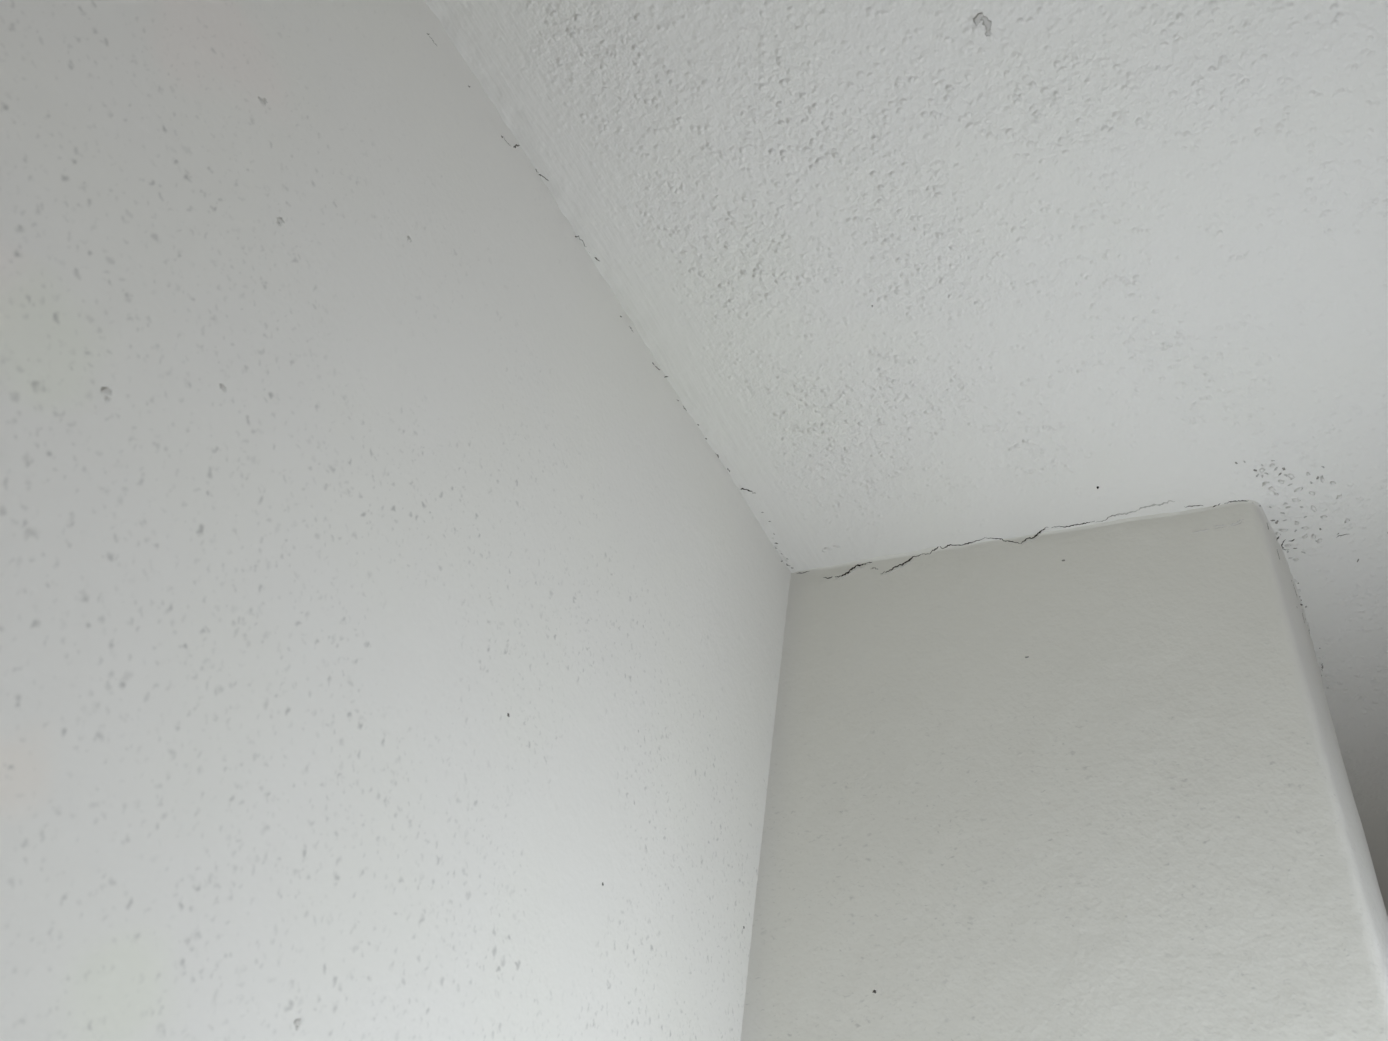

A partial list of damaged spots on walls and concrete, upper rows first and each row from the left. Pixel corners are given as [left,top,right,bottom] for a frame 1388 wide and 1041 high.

crack [796,500,1261,580]